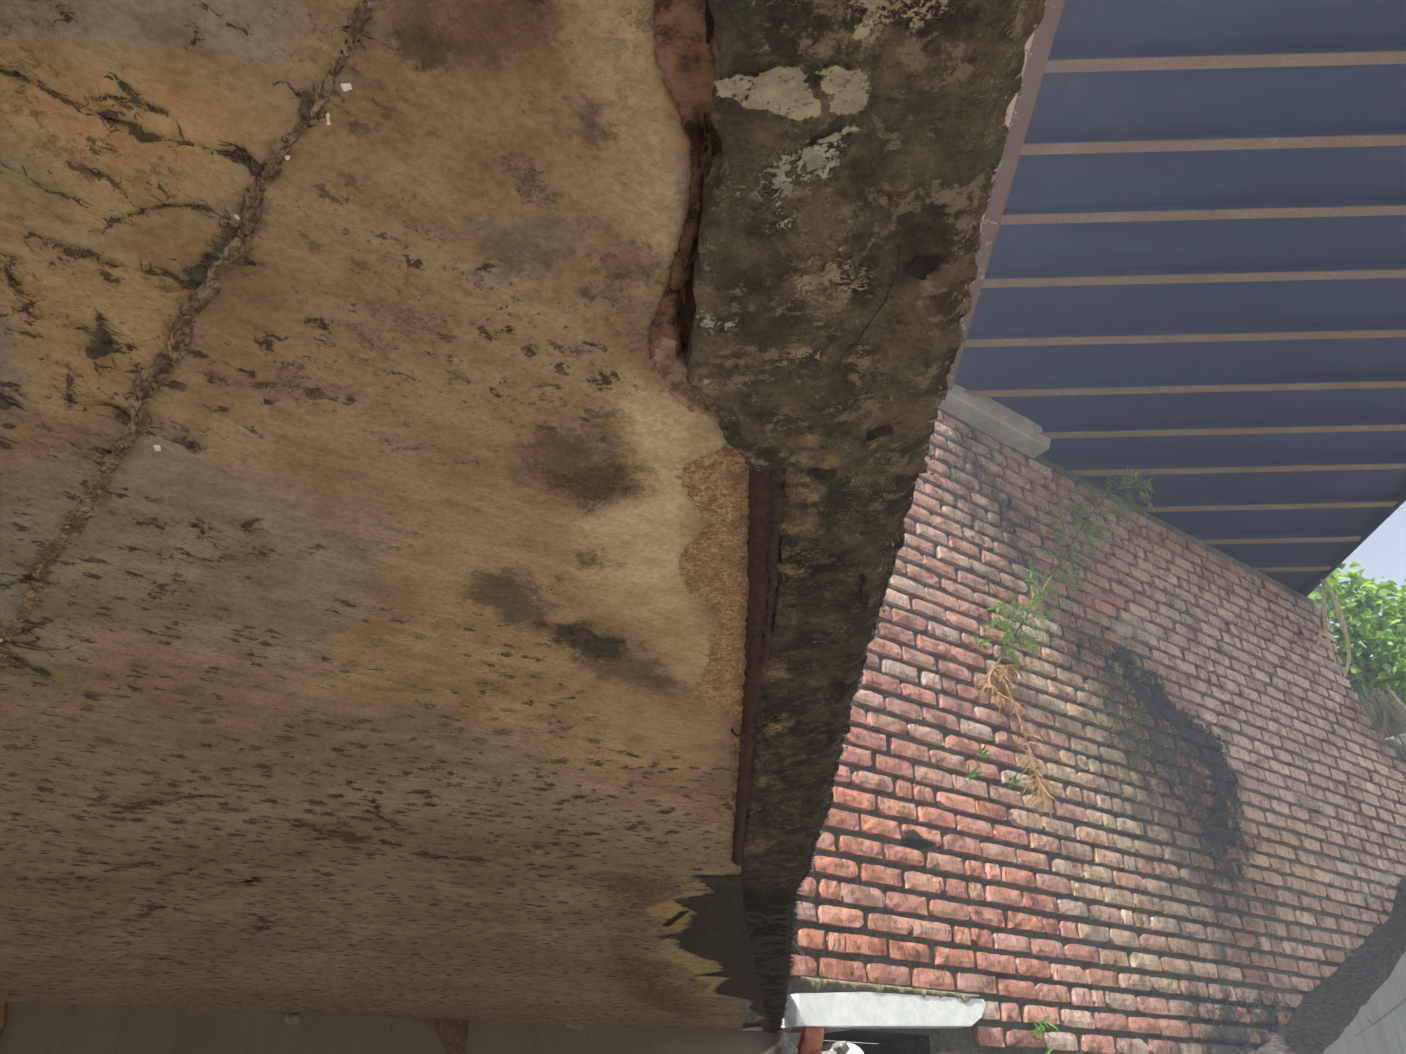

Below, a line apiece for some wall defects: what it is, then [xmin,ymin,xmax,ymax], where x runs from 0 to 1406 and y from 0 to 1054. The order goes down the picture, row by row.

crack [704,0,714,43]
peeling [713,0,949,228]
crack [0,0,390,684]
peeling [697,310,738,335]
leakage [470,573,673,696]
spalling [674,442,796,854]
corrosion [731,467,786,866]
peeling [774,73,1023,1020]
leakage [939,432,1041,599]
leakage [1050,610,1246,884]
leakage [600,831,818,1033]
leakage [1186,990,1291,1054]